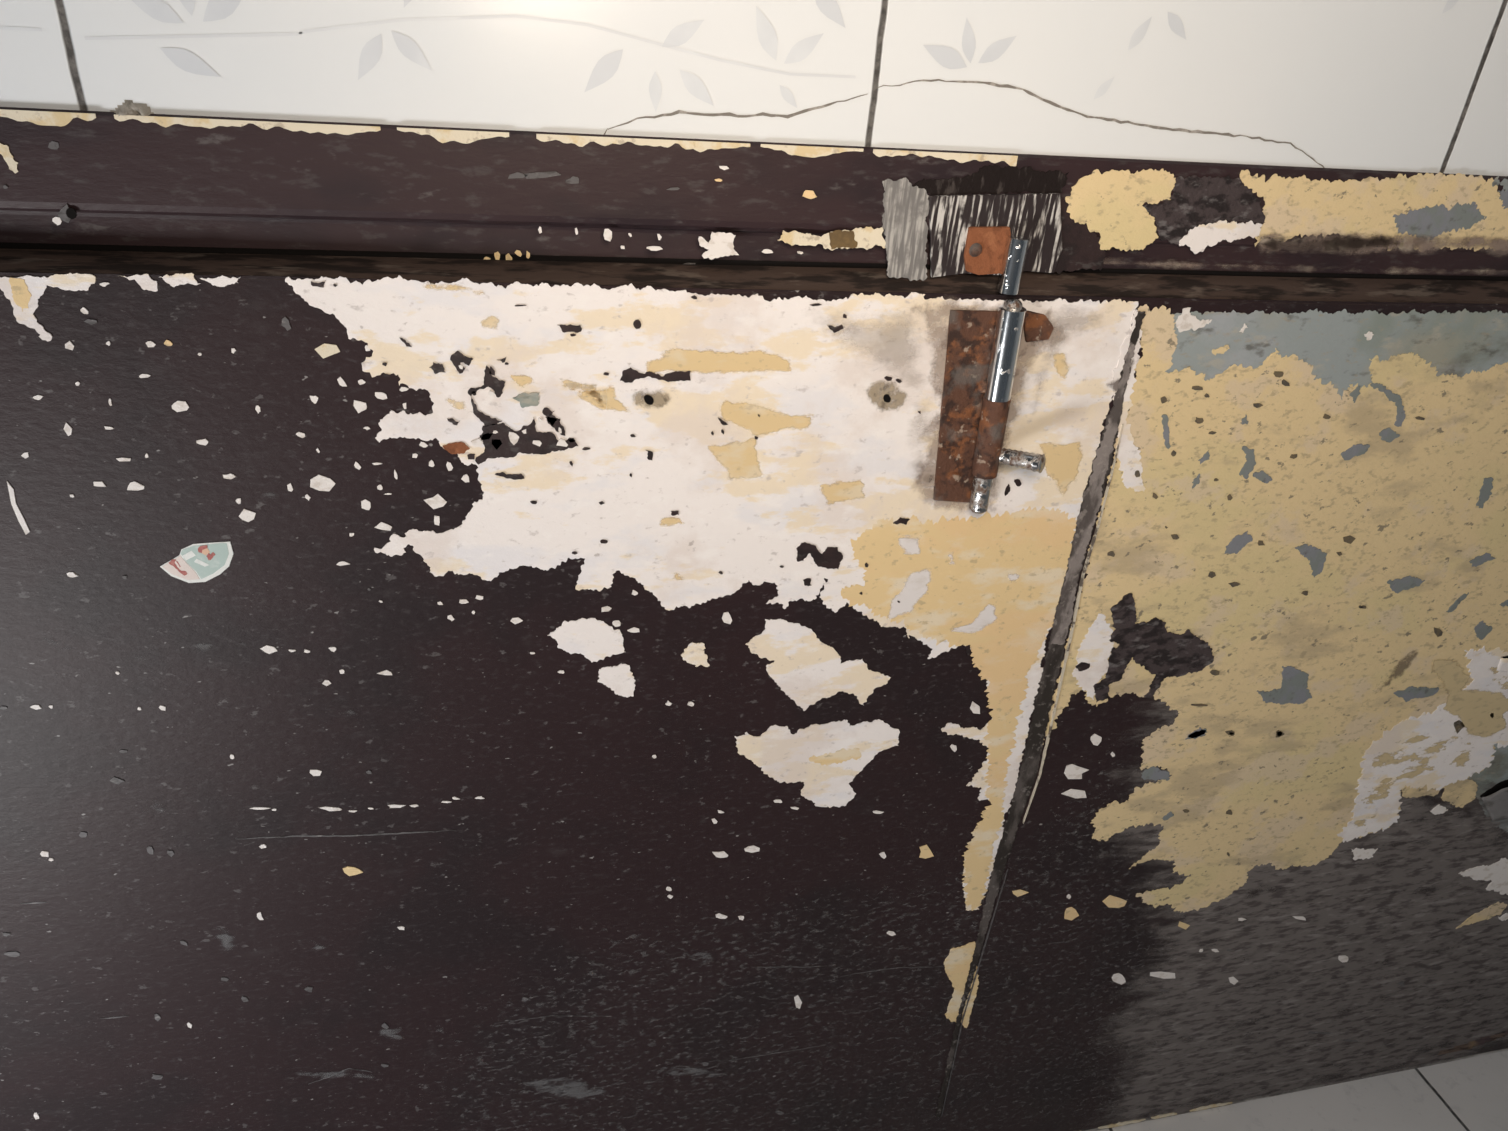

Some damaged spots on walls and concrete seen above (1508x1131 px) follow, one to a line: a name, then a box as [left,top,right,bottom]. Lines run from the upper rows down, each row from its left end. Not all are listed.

peeling [0,143,19,189]
peeling [0,109,96,150]
peeling [114,114,509,144]
crack [603,79,1324,168]
peeling [0,273,240,350]
spalling [172,401,189,412]
rust [925,302,998,396]
rust [1002,312,1062,447]
rust [916,416,968,510]
spalling [7,481,30,534]
spalling [236,498,256,522]
peeling [285,134,1508,1131]